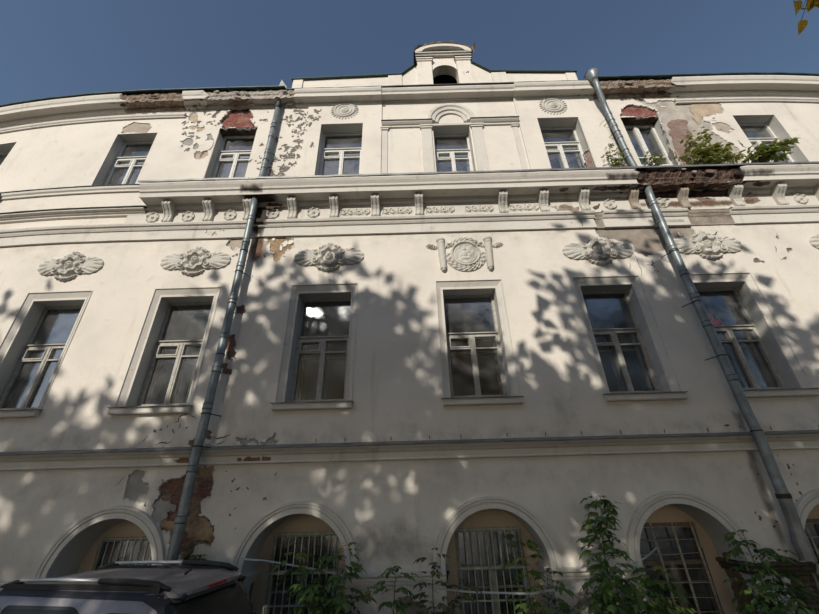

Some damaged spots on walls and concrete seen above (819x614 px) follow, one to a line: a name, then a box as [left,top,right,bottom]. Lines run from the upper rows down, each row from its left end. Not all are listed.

flaking render [111,89,321,177]
spalling [578,79,770,204]
flaking render [255,237,295,262]
flaking render [593,203,735,258]
spalling [220,334,238,375]
spalling [123,469,186,552]
spalling [179,465,215,560]